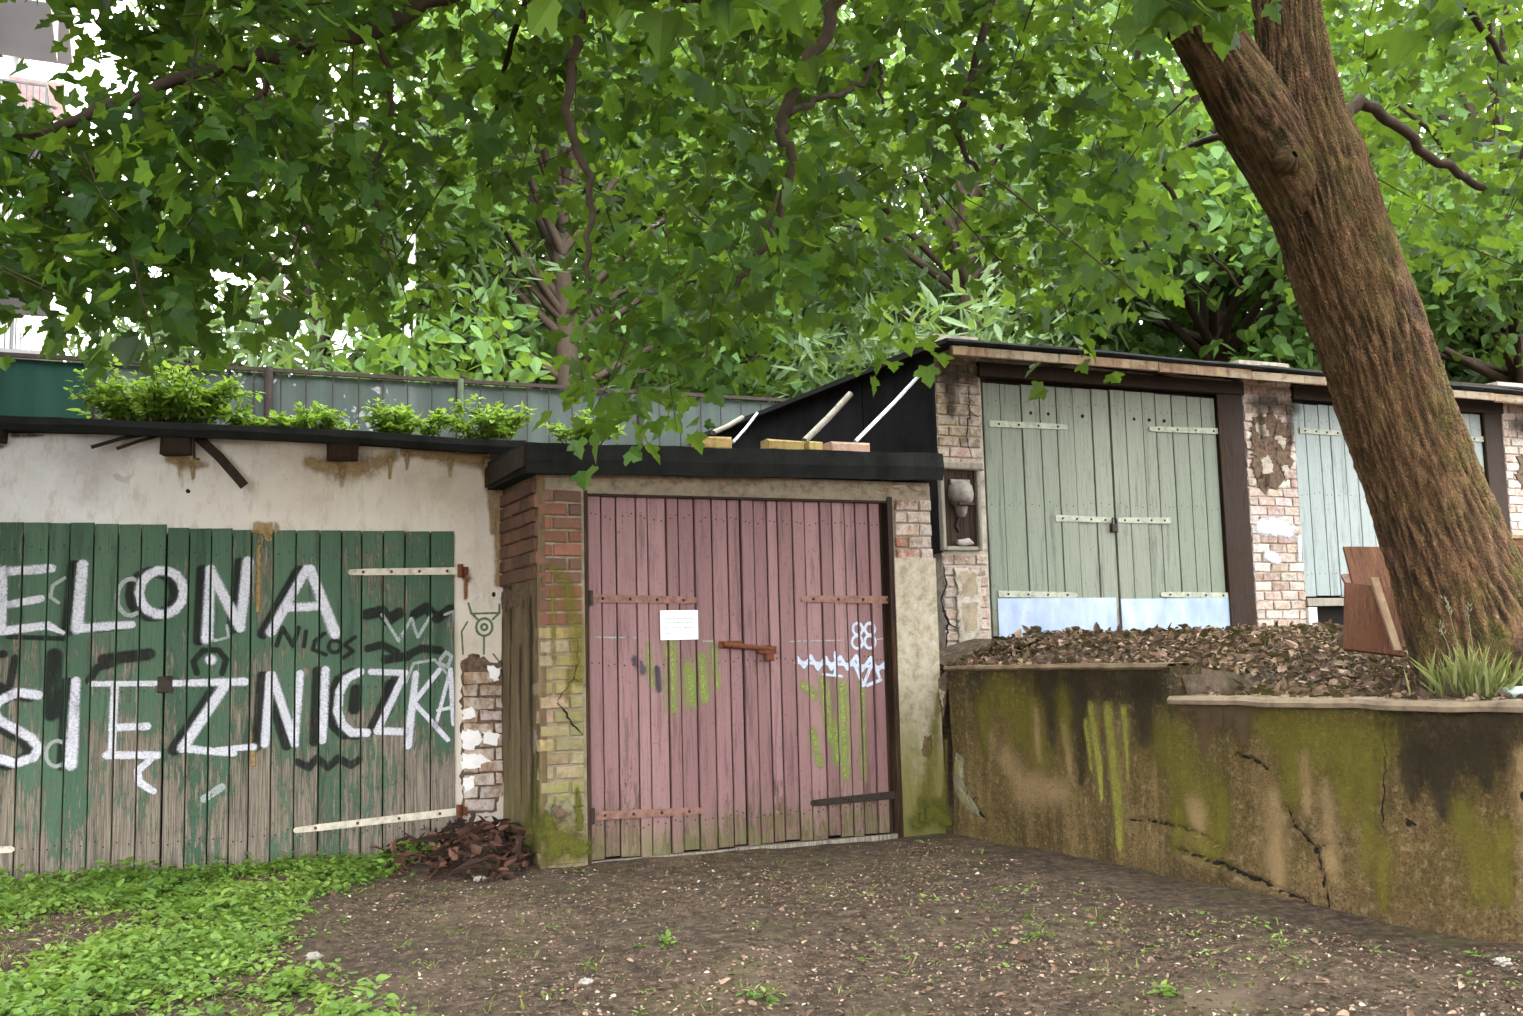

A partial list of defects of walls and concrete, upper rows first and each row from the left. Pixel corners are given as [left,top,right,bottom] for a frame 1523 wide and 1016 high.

damp [305,449,511,590]
spalling [1249,411,1294,494]
spalling [1514,455,1523,489]
flaking render [459,653,504,816]
damp [501,597,534,826]
damp [1035,669,1159,801]
damp [1179,704,1262,754]
crack [1238,753,1270,770]
damp [1380,692,1518,818]
crack [1130,804,1336,907]